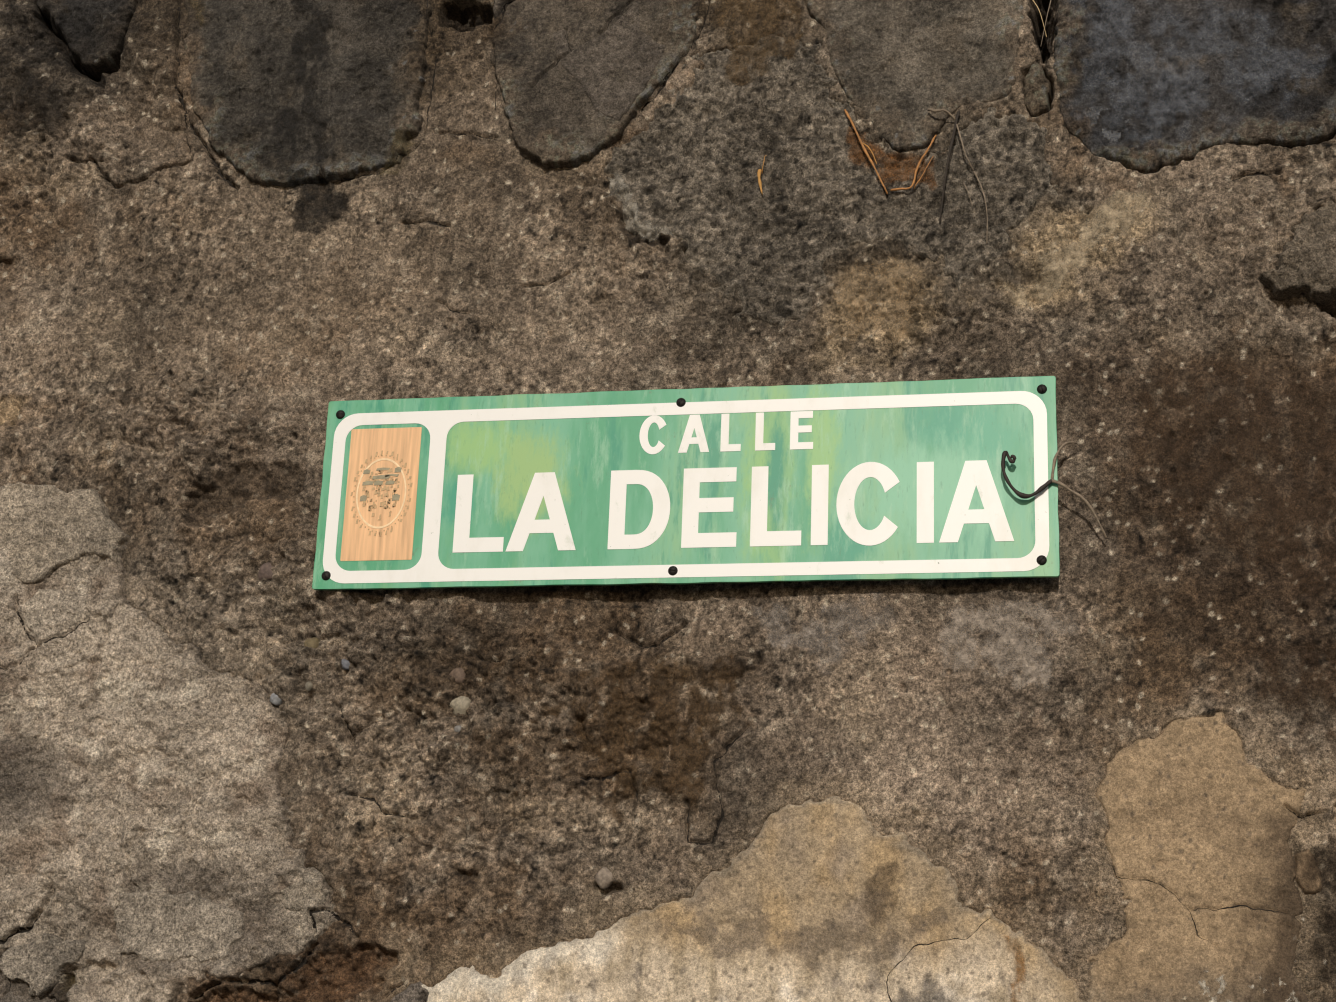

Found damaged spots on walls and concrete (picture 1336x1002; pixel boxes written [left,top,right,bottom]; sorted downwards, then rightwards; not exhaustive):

crack [339,0,515,184]
crack [636,3,710,118]
spalling [0,482,338,1002]
peeling [390,712,1322,1002]
crack [886,918,990,1002]
efflorescence [1198,976,1231,1002]